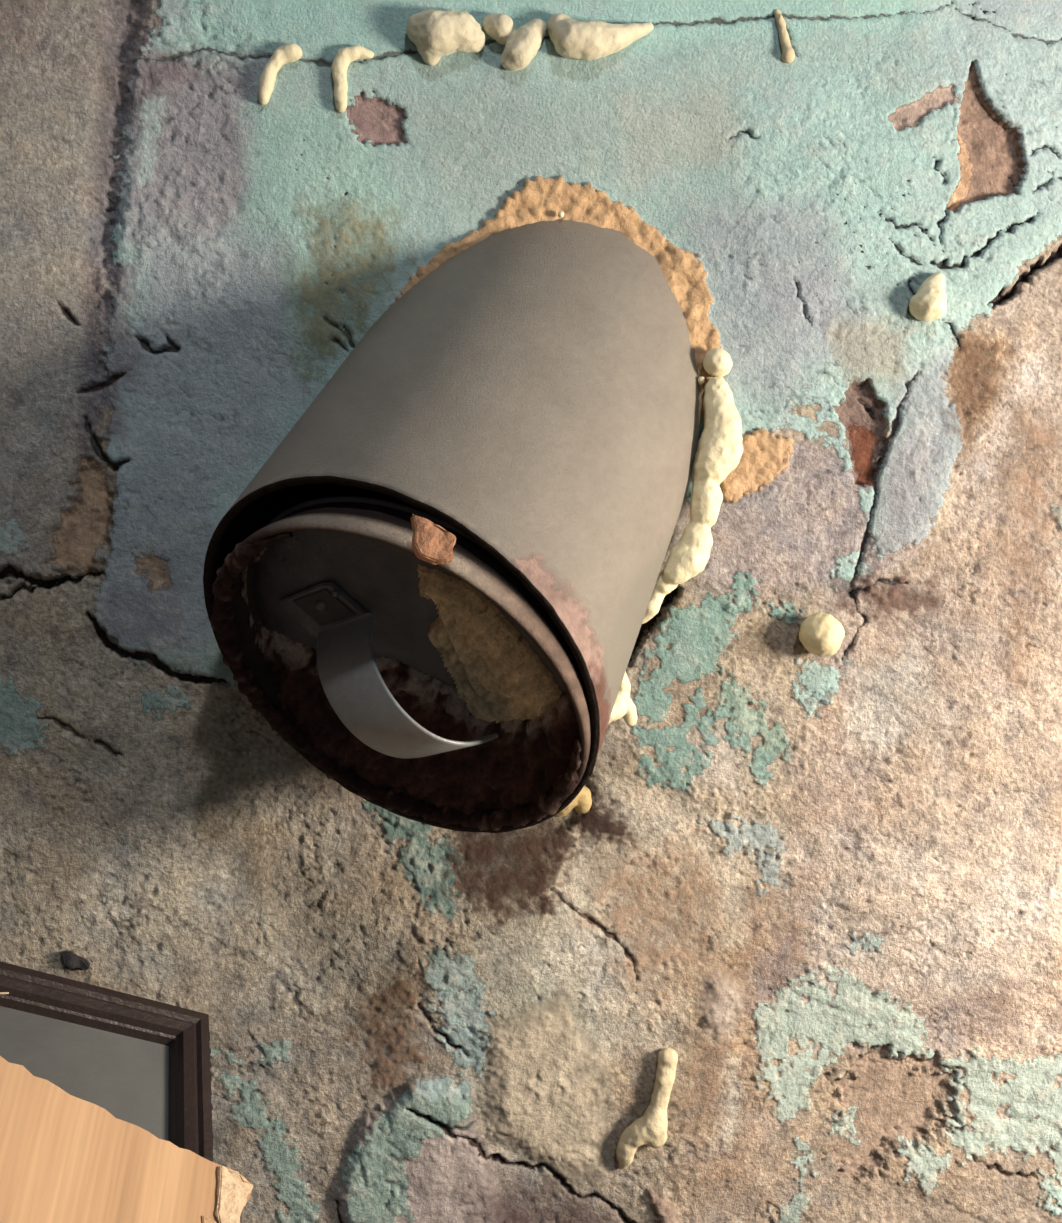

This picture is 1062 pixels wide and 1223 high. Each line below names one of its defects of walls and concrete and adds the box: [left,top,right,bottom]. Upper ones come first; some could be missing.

crack [134,47,418,67]
crack [653,1,1062,57]
peeling [46,0,1062,720]
peeling [0,512,29,555]
crack [839,372,918,668]
crack [0,565,104,600]
crack [87,612,226,684]
rust [514,556,610,777]
peeling [698,813,790,896]
crack [551,890,639,982]
peeling [753,929,1062,1223]
crack [406,1108,633,1223]